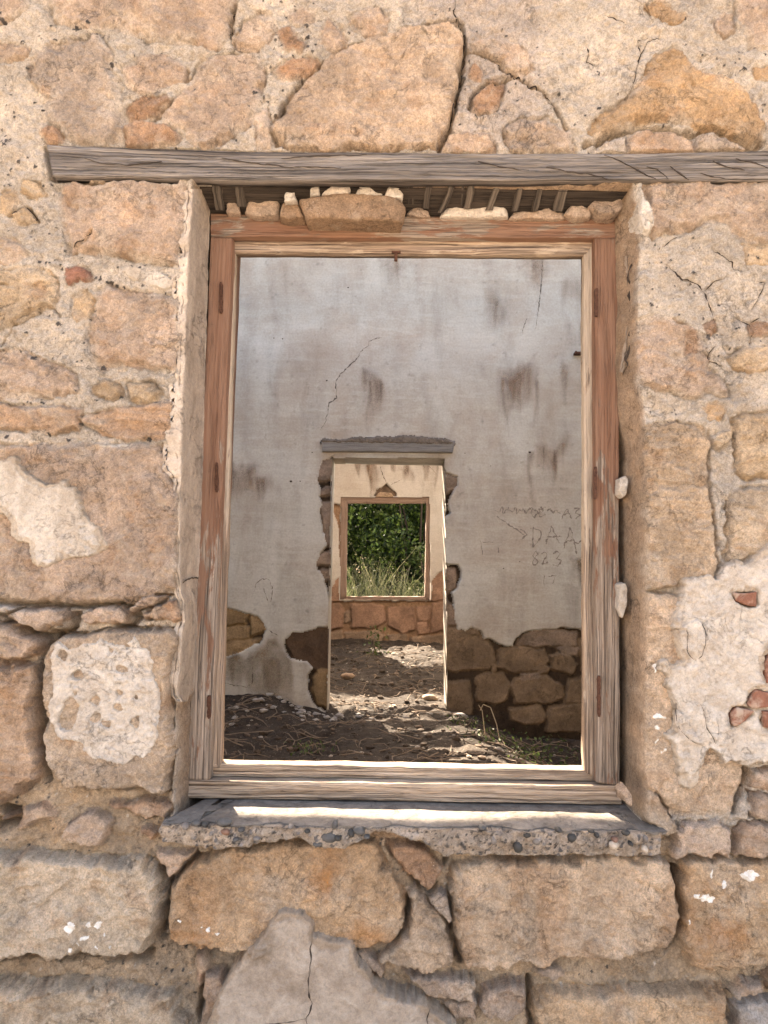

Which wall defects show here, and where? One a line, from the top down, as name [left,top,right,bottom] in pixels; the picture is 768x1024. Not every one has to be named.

crack [665,237,764,344]
crack [321,337,381,429]
peeling [226,608,266,656]
peeling [678,619,706,660]
peeling [653,707,718,754]